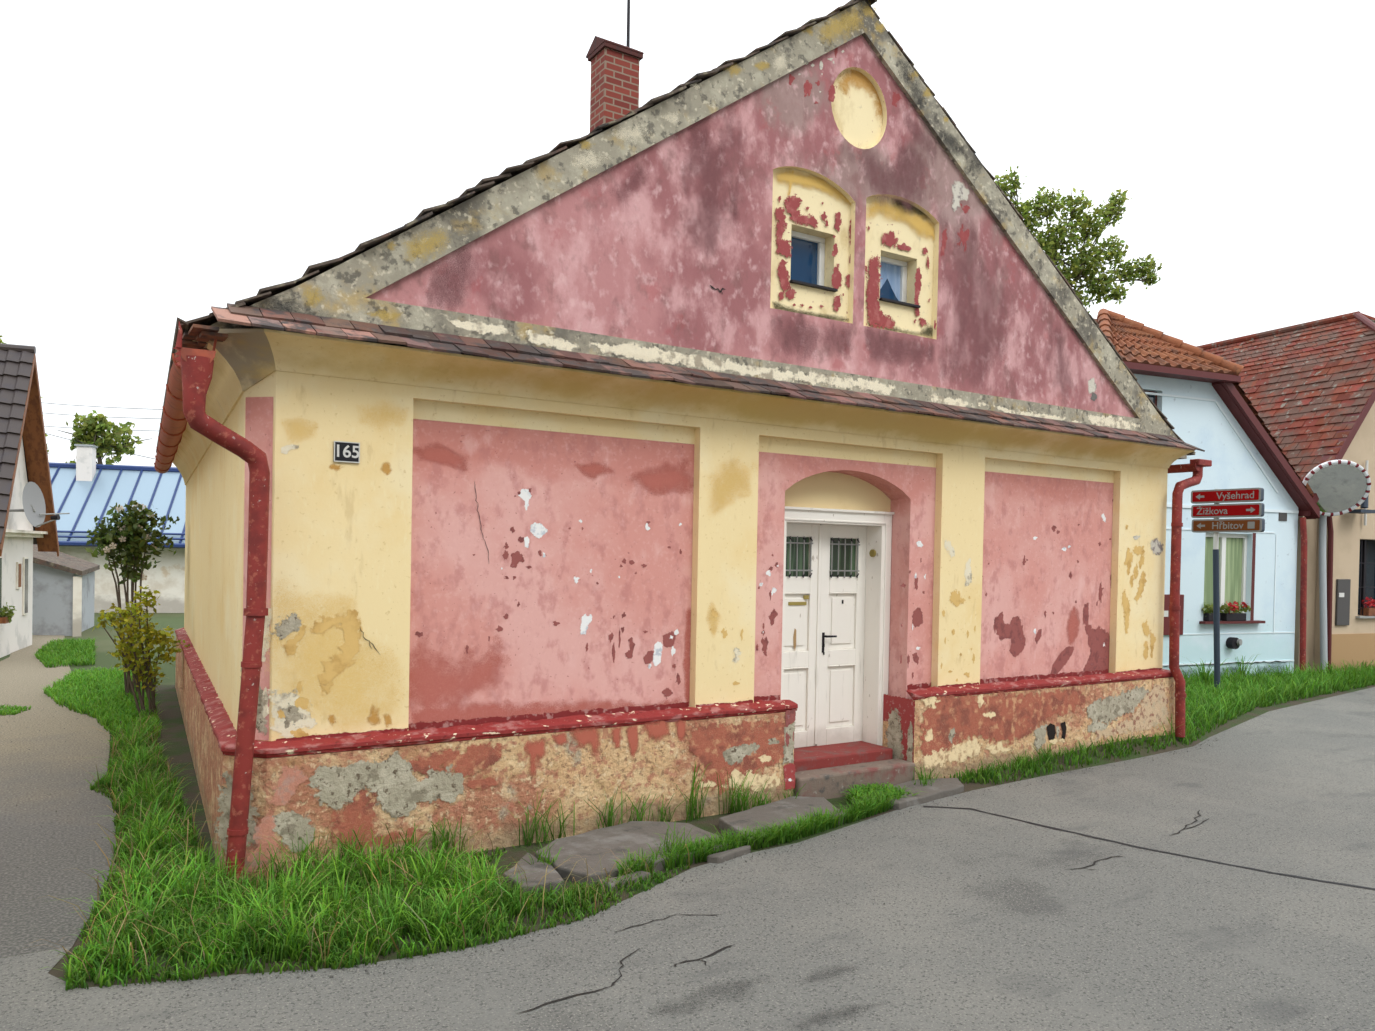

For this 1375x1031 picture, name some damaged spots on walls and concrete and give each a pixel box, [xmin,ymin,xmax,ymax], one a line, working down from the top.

peeling [774,181,970,330]
peeling [448,318,895,395]
peeling [501,488,548,580]
spalling [256,607,363,738]
peeling [580,614,592,652]
peeling [609,612,681,698]
peeling [710,554,779,663]
peeling [883,525,1169,770]
spalling [214,771,233,867]
spalling [244,741,503,881]
crack [519,914,735,1013]